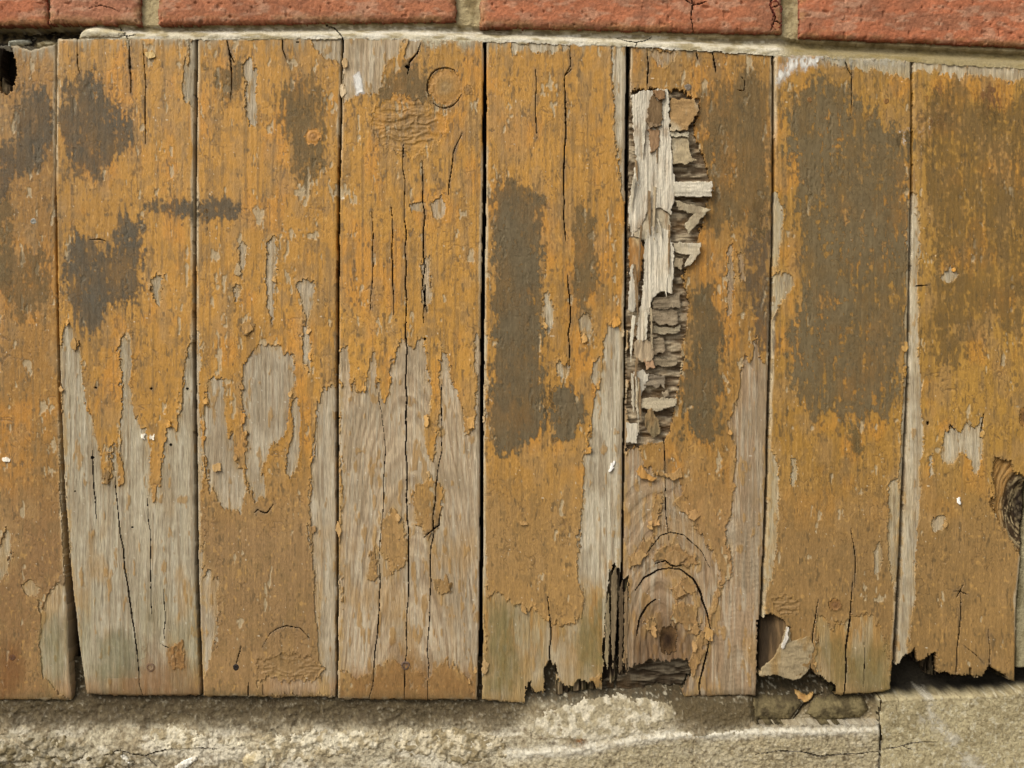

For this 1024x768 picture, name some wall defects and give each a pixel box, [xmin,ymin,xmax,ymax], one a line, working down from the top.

leakage [0,67,134,323]
crack [93,461,169,695]
leakage [61,195,241,341]
crack [369,144,442,699]
peeling [22,273,798,704]
leakage [487,177,589,458]
crack [563,58,571,241]
crack [565,276,573,366]
peeling [646,90,699,165]
crack [635,488,711,694]
leakage [721,69,942,458]
peeling [810,193,985,695]